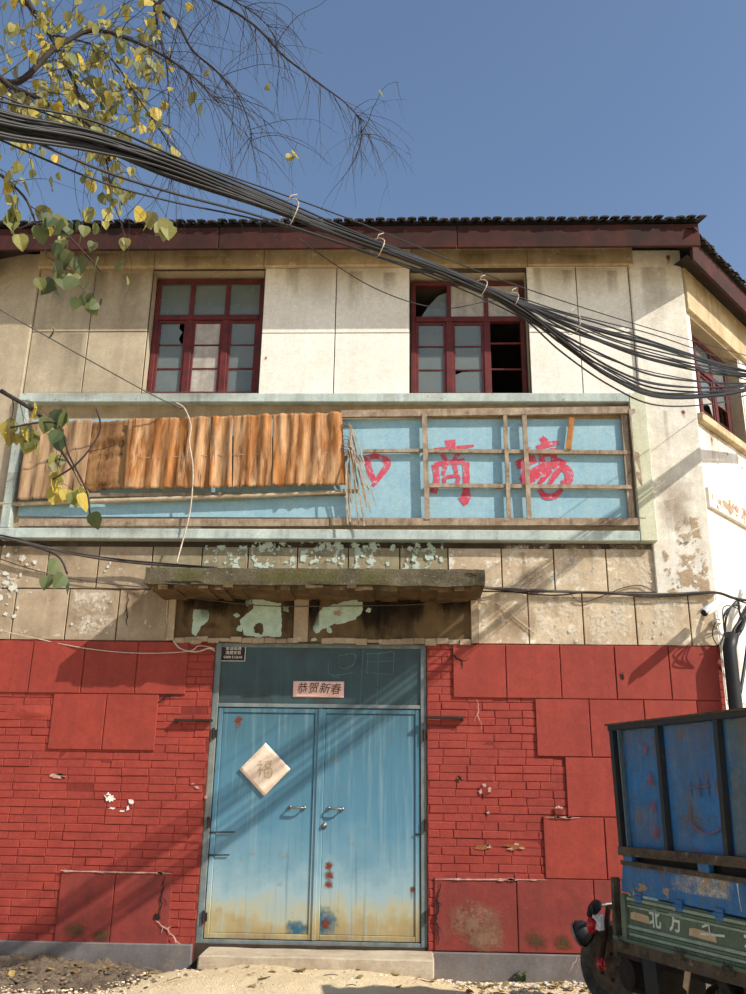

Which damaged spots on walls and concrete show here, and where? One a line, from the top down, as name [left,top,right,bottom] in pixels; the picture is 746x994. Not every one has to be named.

peeling [712,494,746,523]
peeling [204,542,443,569]
peeling [0,546,40,618]
peeling [641,517,710,645]
peeling [192,609,209,636]
peeling [233,599,289,638]
peeling [311,600,371,641]
peeling [104,792,134,812]
crack [154,876,180,944]
rust [288,922,307,934]
rust [319,911,336,934]
crack [434,884,442,945]